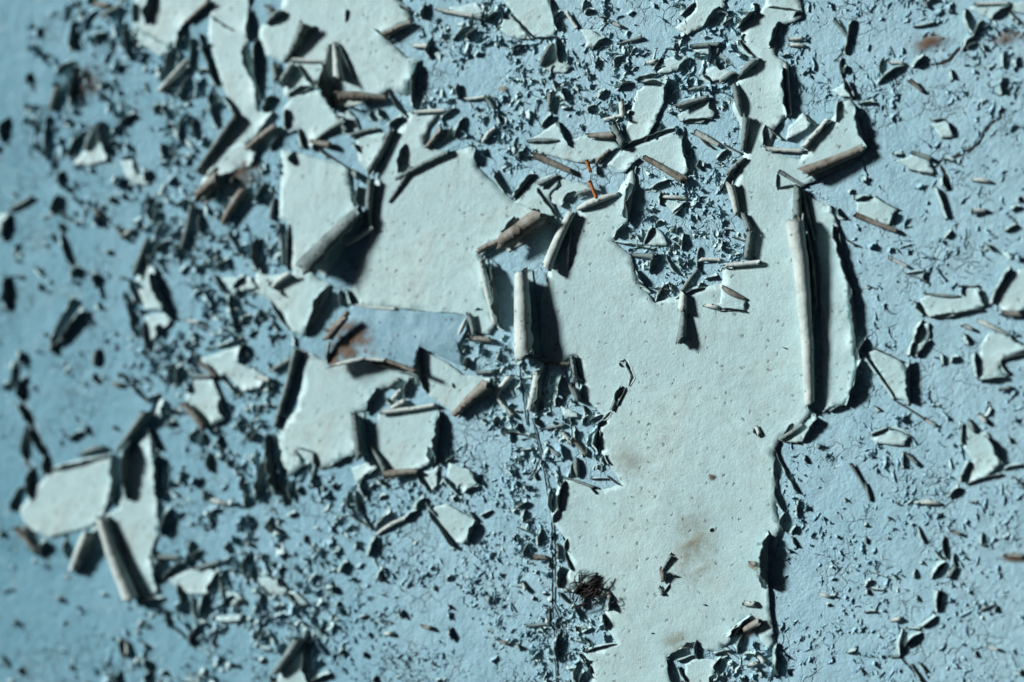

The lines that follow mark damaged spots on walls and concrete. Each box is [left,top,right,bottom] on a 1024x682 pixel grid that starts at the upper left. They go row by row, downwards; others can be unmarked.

peeling [891,118,968,221]
peeling [0,191,34,261]
peeling [846,189,900,234]
peeling [979,186,1023,262]
peeling [0,273,22,313]
peeling [42,292,91,376]
rust [330,323,370,365]
peeling [960,318,1024,429]
peeling [187,489,236,535]
peeling [849,462,877,516]
peeling [960,544,1024,593]
peeling [793,534,1001,682]